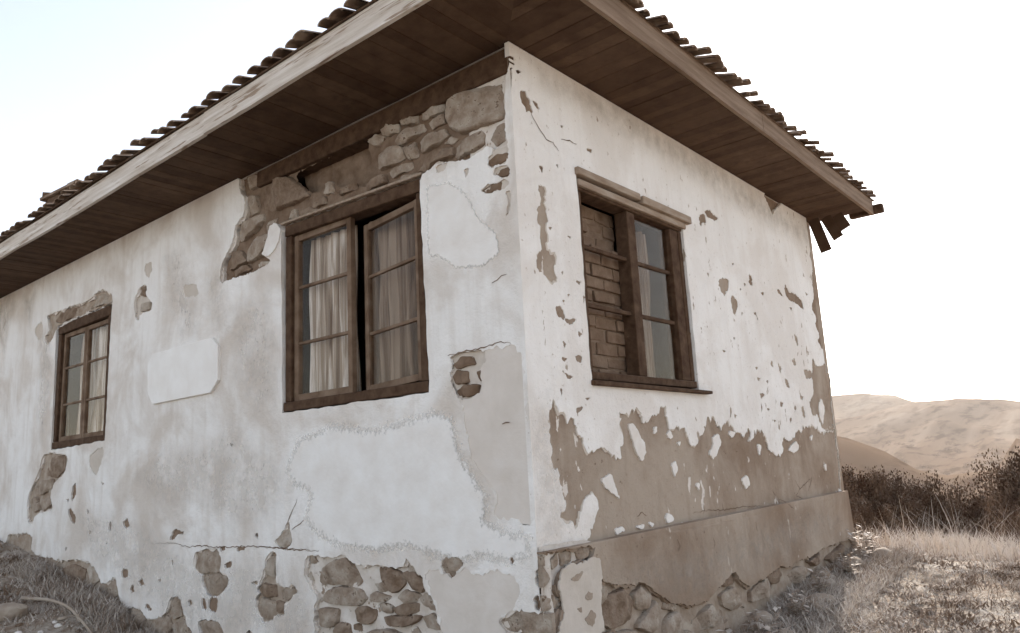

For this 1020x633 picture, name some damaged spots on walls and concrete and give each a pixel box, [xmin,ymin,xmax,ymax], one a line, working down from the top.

spalling [520,91,575,148]
spalling [222,47,518,282]
peeling [536,185,563,285]
flaking render [35,289,113,345]
spalling [556,294,582,337]
spalling [718,275,752,315]
spalling [777,279,821,346]
peeling [306,341,853,633]
spalling [6,453,232,633]
crack [162,542,316,551]
flaking render [254,501,304,622]